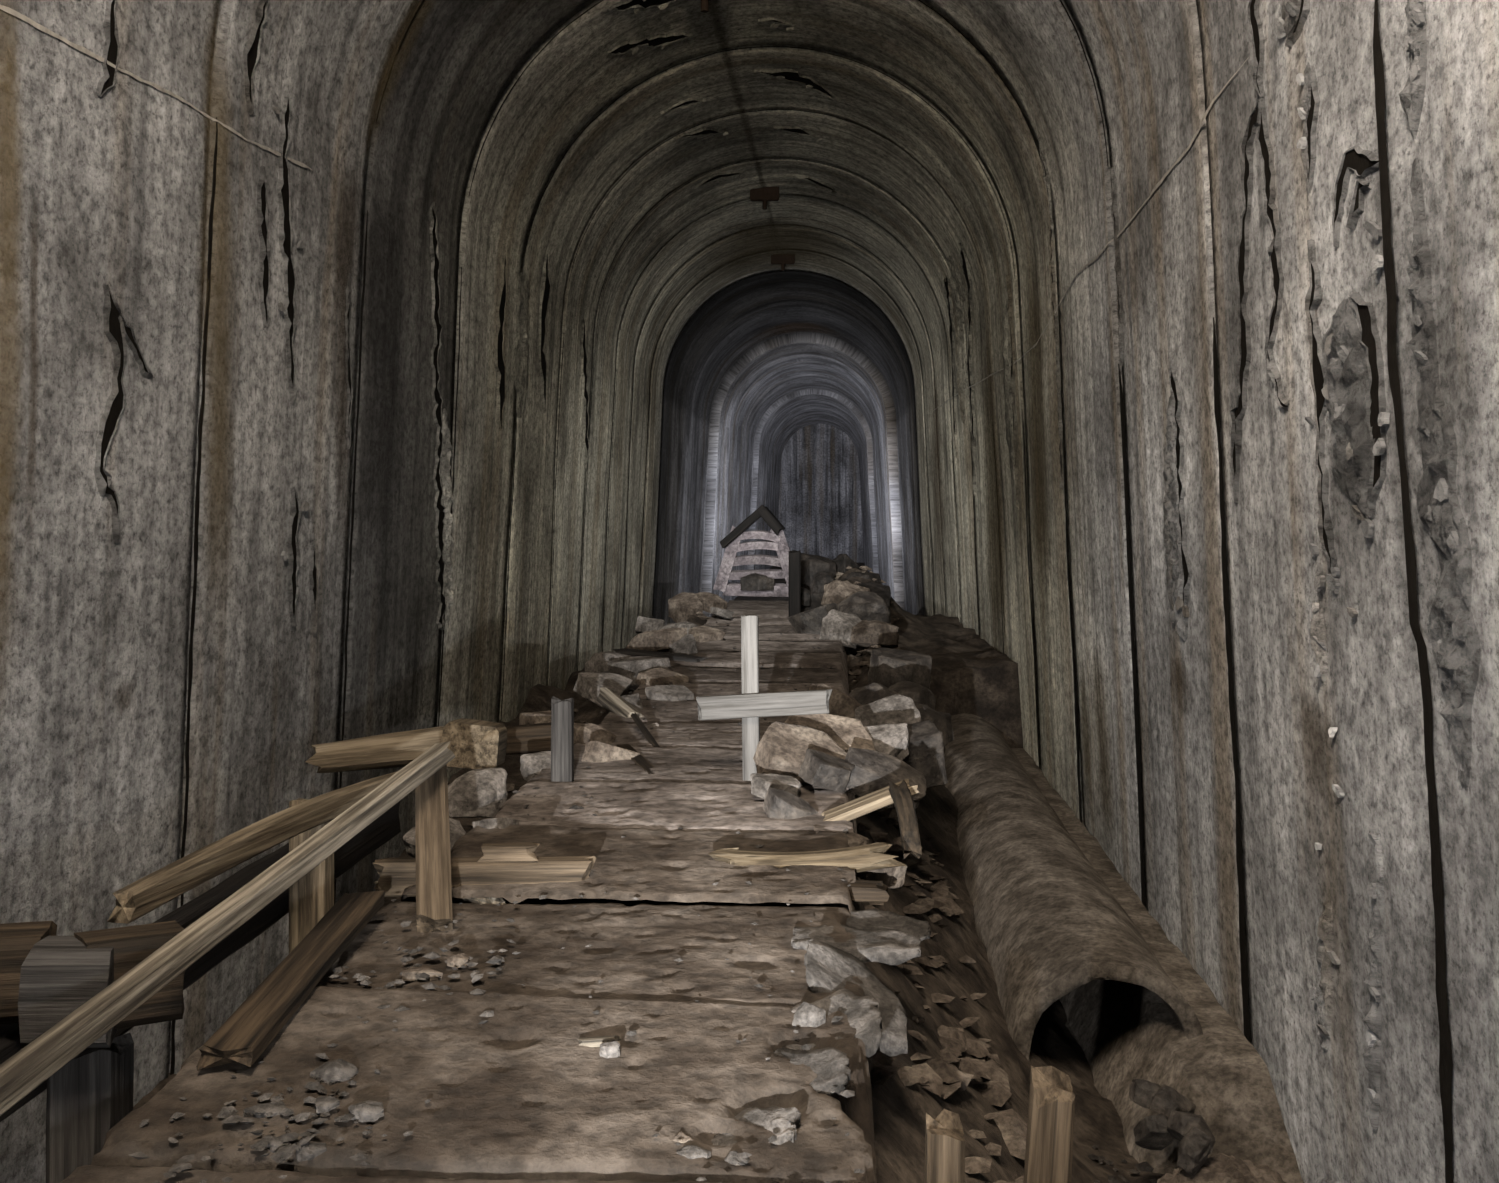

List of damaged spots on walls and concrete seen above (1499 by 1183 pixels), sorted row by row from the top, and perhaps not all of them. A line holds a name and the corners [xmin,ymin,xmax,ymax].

crack [0,0,312,170]
spalling [1274,0,1310,49]
crack [94,284,153,543]
crack [934,0,1379,594]
spalling [1321,292,1390,538]
spalling [1364,221,1384,274]